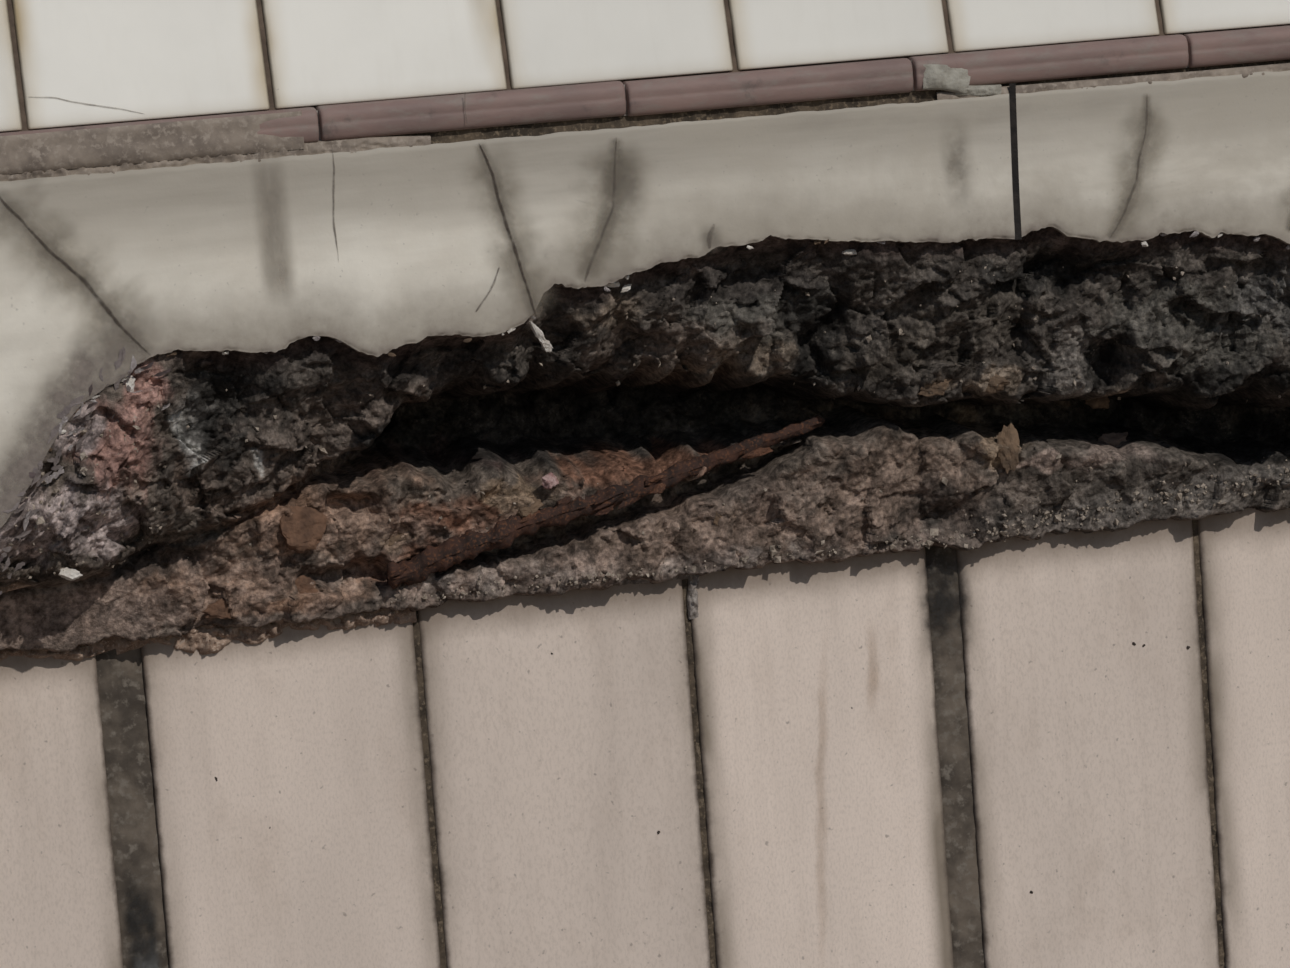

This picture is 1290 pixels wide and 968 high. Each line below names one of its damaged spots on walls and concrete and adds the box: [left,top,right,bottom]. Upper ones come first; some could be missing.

crack [1,199,146,351]
crack [464,100,535,313]
crack [586,141,617,277]
crack [1115,153,1141,230]
spalling [0,227,1290,661]